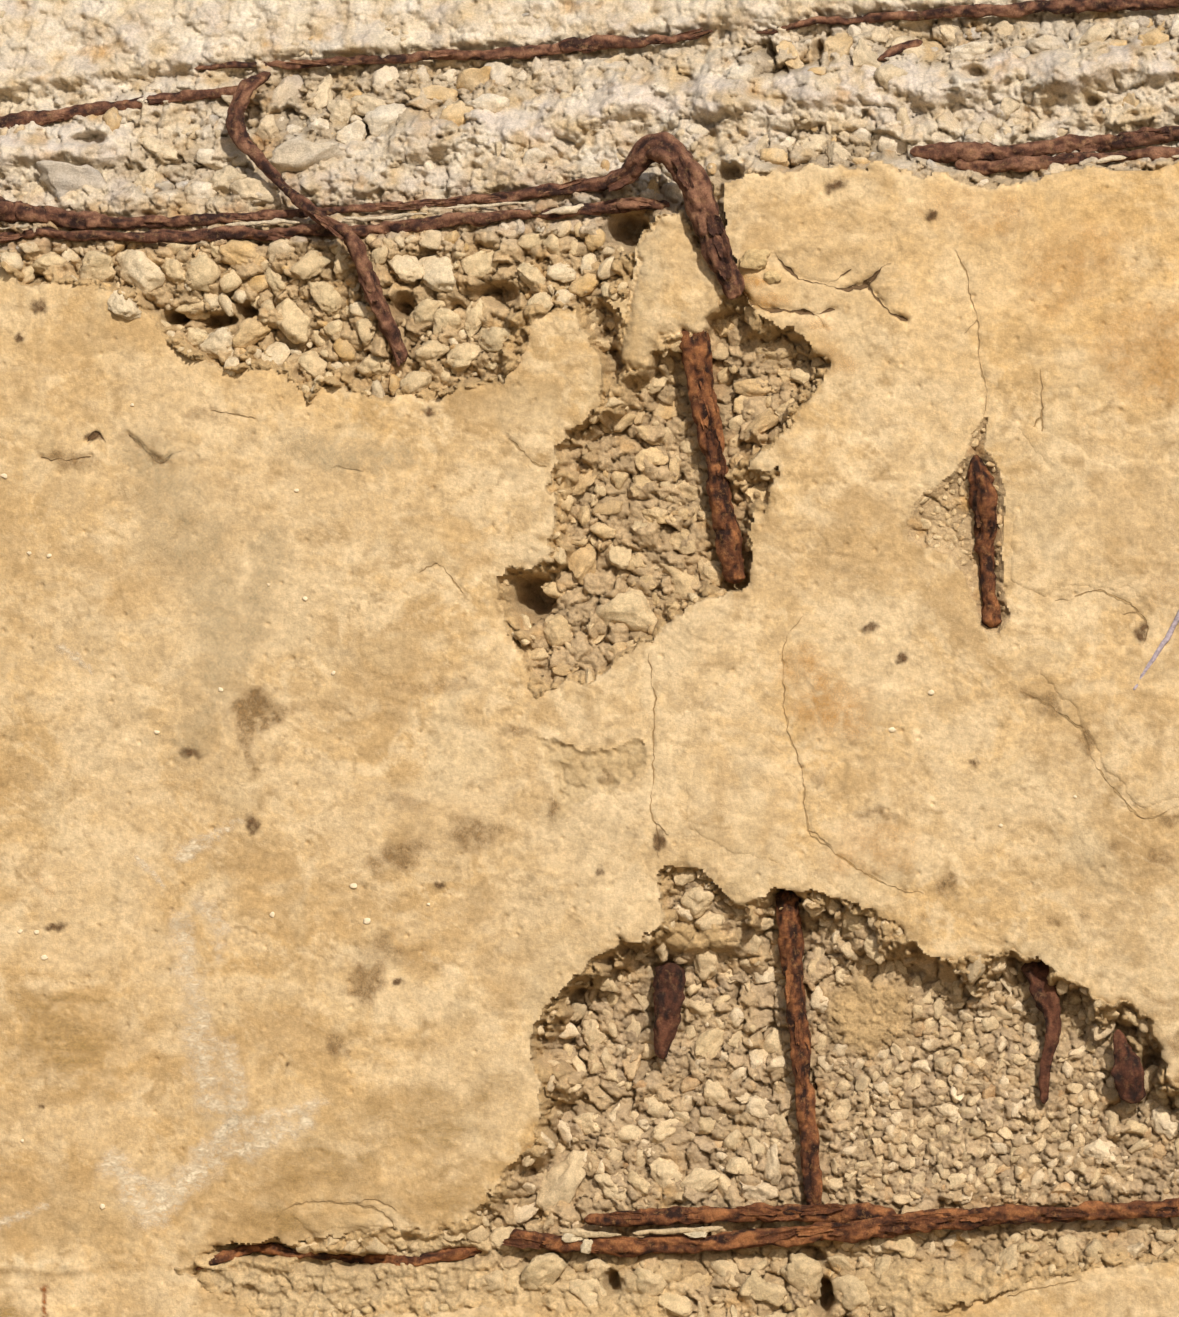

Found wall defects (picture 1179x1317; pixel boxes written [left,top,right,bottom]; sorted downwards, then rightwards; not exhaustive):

spalling [0,0,1179,699]
crack [648,655,668,851]
crack [781,616,924,894]
crack [1021,691,1171,819]
crack [1055,589,1149,644]
spalling [174,865,1179,1317]